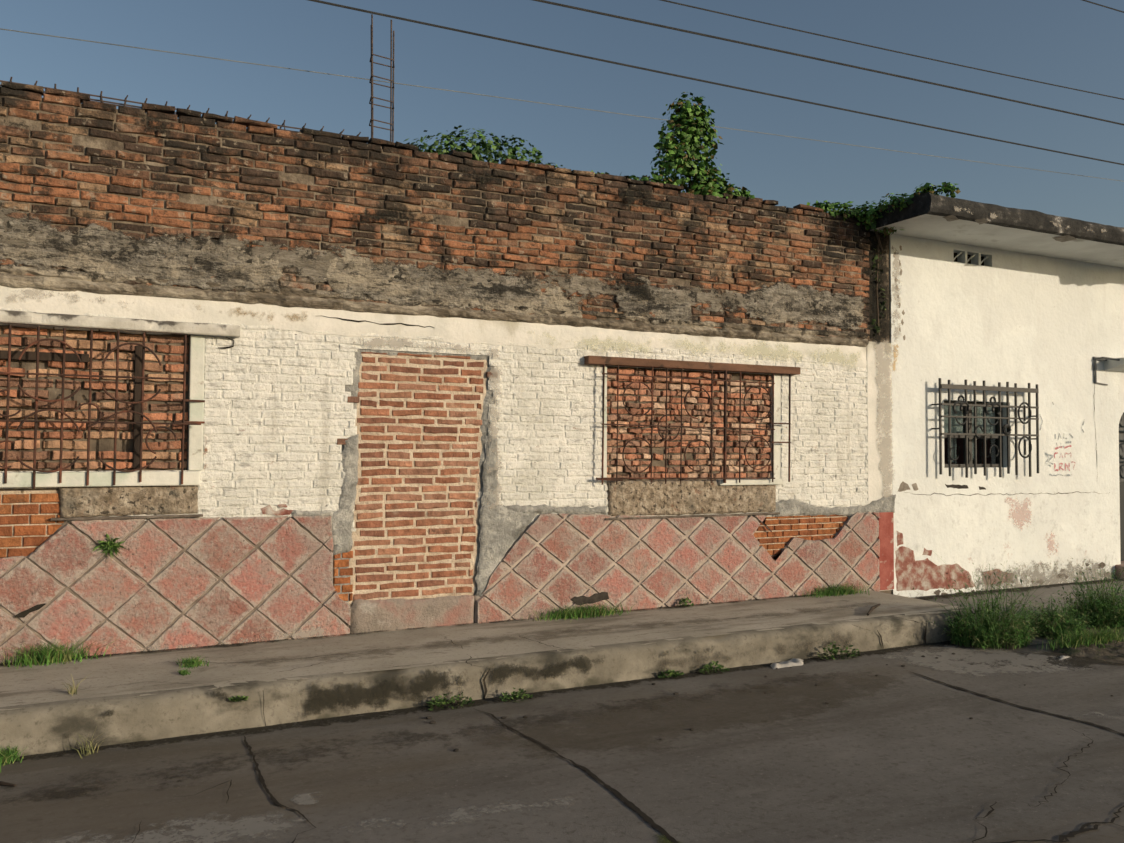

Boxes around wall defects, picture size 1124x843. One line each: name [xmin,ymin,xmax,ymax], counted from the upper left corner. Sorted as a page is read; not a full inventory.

water stain [349,206,440,224]
crack [324,316,434,328]
flaking render [753,514,848,558]
peeling [895,531,1014,595]
water stain [977,560,1115,591]
water stain [485,655,603,684]
water stain [305,670,464,715]
crack [1027,729,1093,808]
crack [972,801,997,843]
crack [1059,822,1124,843]